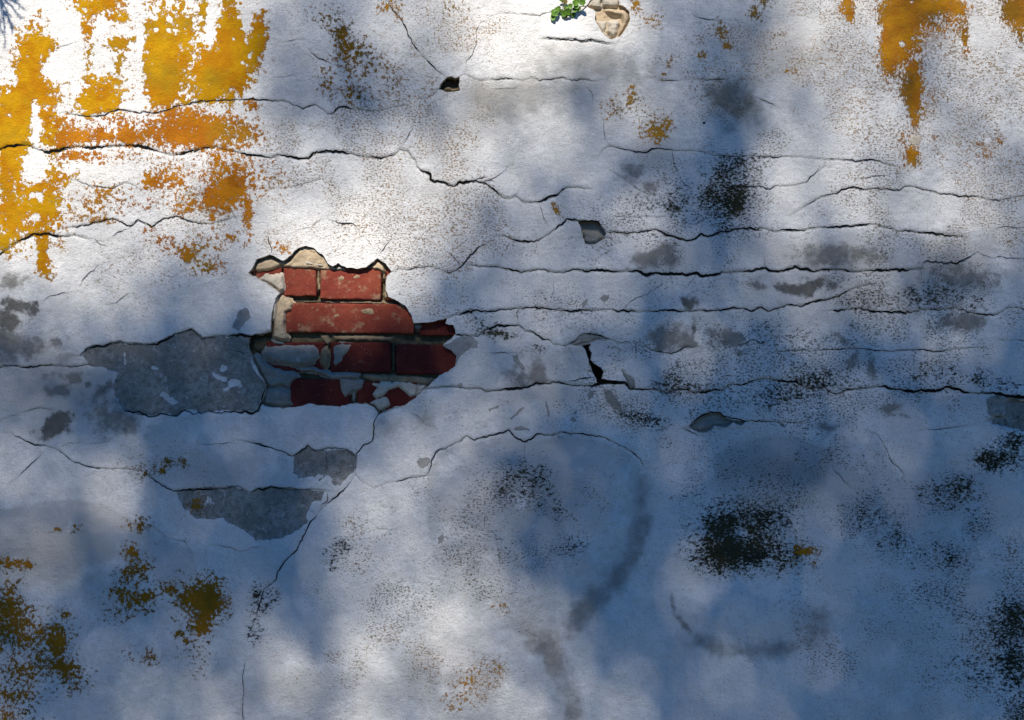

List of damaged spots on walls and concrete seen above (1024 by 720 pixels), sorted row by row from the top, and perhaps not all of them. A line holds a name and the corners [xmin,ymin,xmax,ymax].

hole [439,76,460,92]
rust [835,0,978,171]
crack [0,5,1024,354]
spalling [578,221,606,245]
flaking render [84,246,478,417]
spalling [689,412,746,433]
crack [427,377,1024,436]
peeling [177,448,356,541]